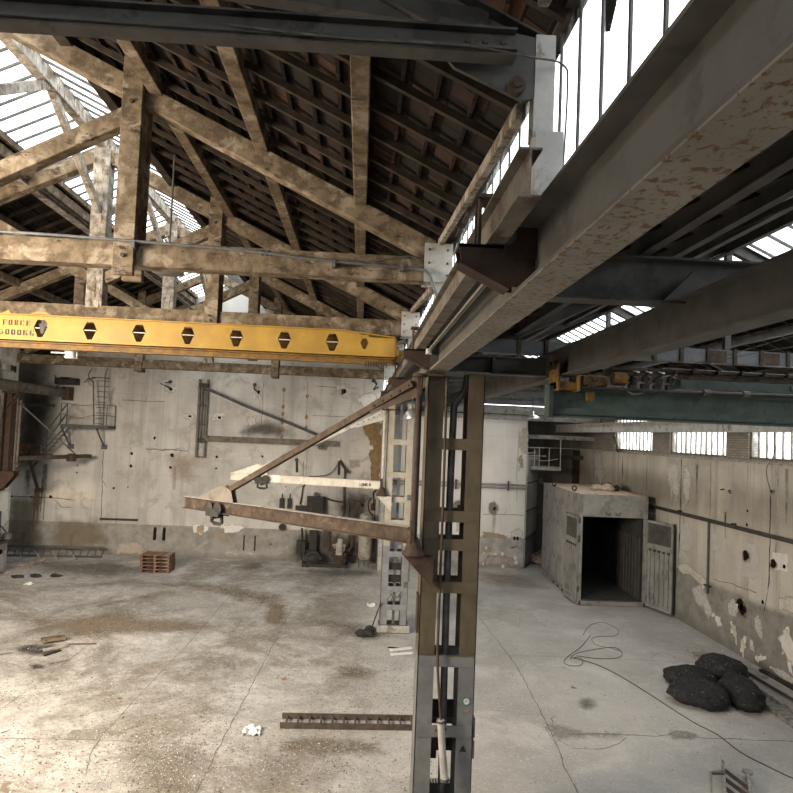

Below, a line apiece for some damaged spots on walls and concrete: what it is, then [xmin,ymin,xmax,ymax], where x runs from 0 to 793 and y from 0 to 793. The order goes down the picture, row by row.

spalling [363,422,382,481]
spalling [481,528,524,568]
hole [736,599,746,618]
crack [518,711,793,749]